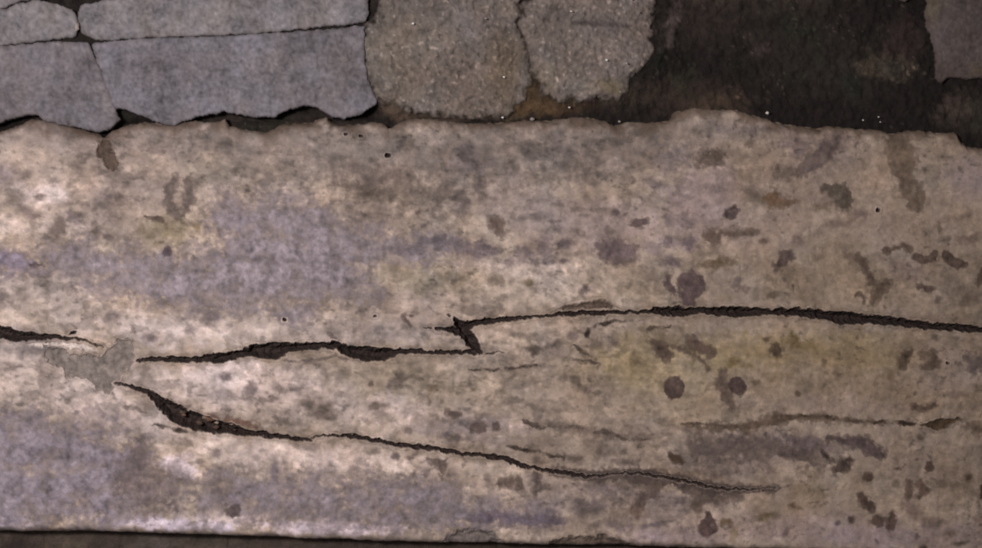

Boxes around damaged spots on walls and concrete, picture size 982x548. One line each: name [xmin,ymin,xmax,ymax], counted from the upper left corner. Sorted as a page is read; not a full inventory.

crack [0,323,107,350]
crack [111,302,982,494]